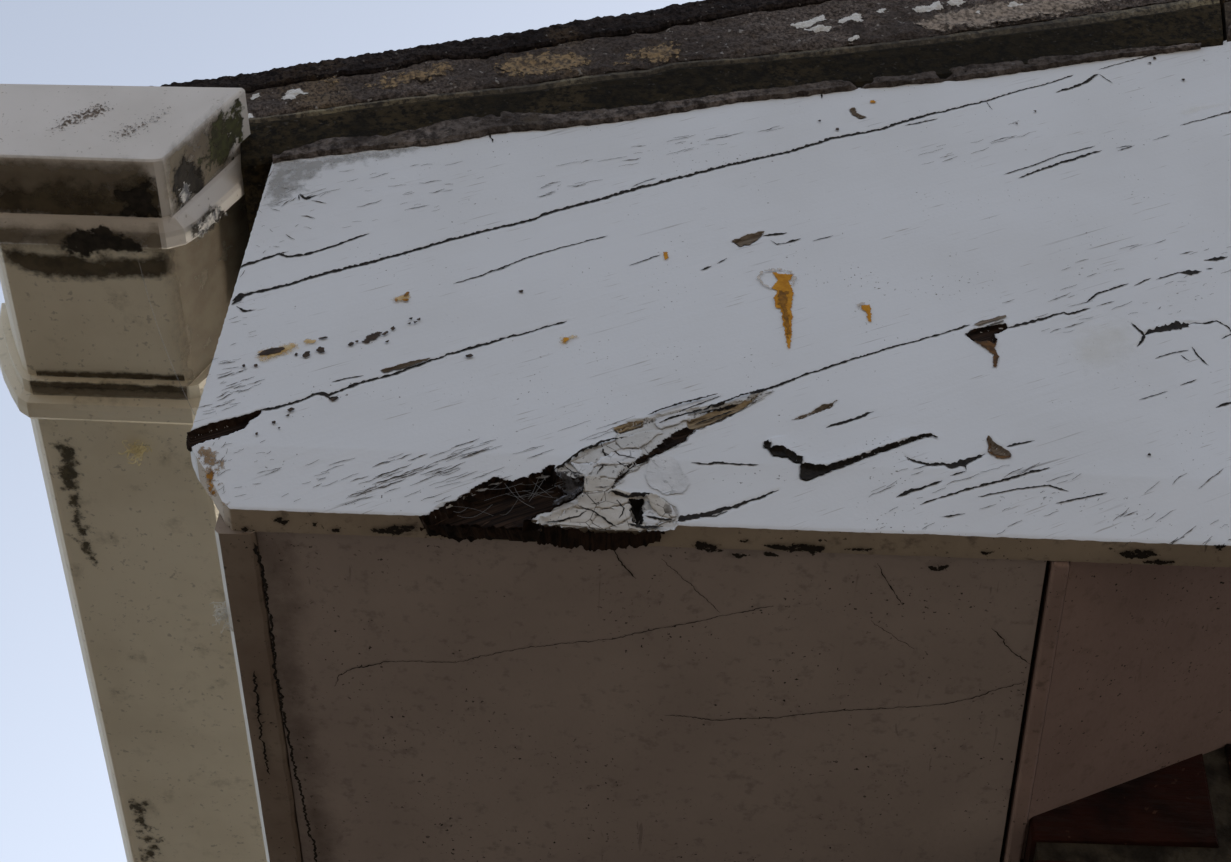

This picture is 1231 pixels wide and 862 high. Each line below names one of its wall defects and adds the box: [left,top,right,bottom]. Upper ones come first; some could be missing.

mould [0,175,173,280]
mould [173,154,205,209]
crack [197,55,1152,578]
corrosion [757,268,797,349]
corrosion [857,302,872,322]
peeling [965,315,1008,367]
crack [1004,240,1231,399]
water stain [54,439,98,566]
peeling [186,410,262,452]
peeling [554,411,691,531]
peeling [763,400,938,481]
crack [869,440,1231,547]